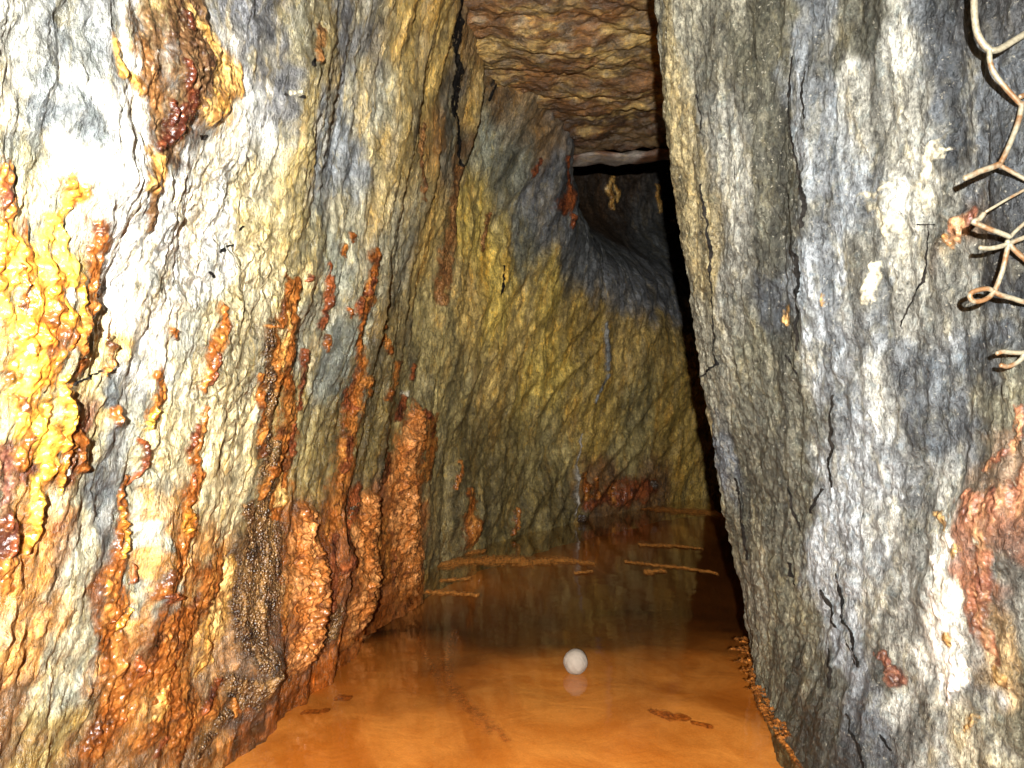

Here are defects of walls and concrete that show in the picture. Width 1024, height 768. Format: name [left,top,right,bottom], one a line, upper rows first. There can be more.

corrosion [0,163,110,596]
corrosion [79,302,238,767]
corrosion [112,0,245,233]
corrosion [258,231,417,575]
crack [694,94,702,133]
crack [699,184,719,378]
crack [733,478,748,561]
crack [785,56,807,394]
crack [787,395,835,532]
corrosion [873,650,908,687]
corrosion [959,464,1024,689]
corrosion [983,405,1024,471]